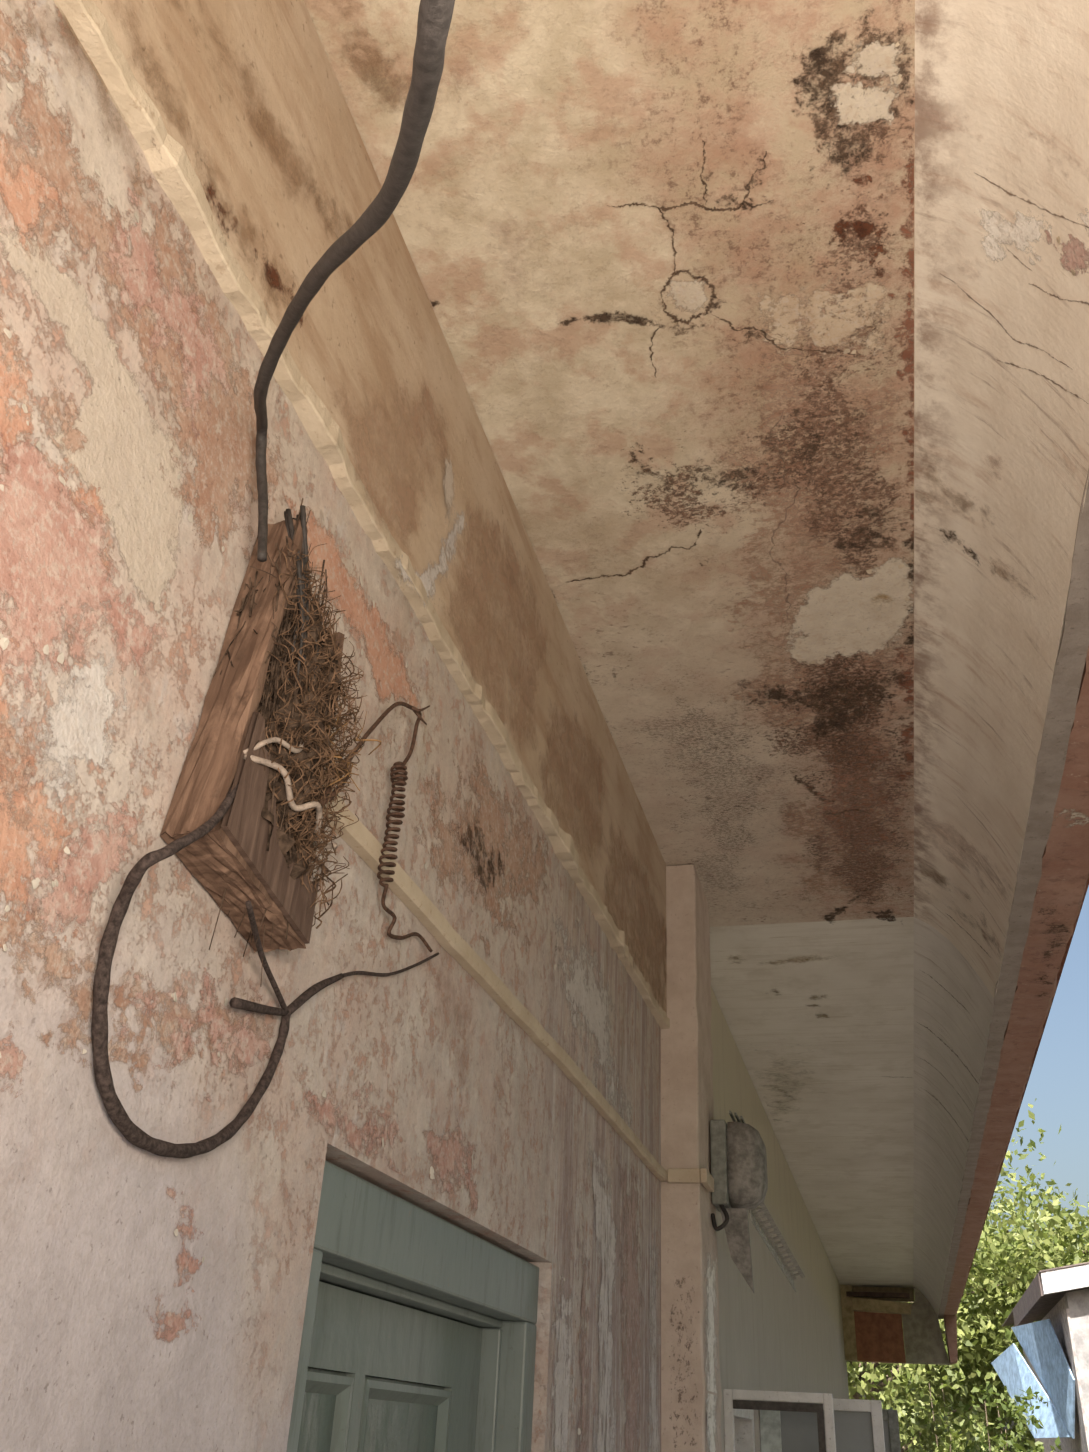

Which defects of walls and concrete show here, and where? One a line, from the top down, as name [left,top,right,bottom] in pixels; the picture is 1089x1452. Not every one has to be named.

spalling [830,40,902,129]
peeling [0,10,420,708]
crack [561,140,860,377]
water stain [622,15,913,582]
spalling [754,281,895,359]
peeling [1045,230,1089,276]
crack [570,529,702,582]
spalling [784,557,914,665]
peeling [0,313,274,1097]
water stain [737,642,914,904]
peeling [305,1080,403,1175]
peeling [146,1185,205,1343]